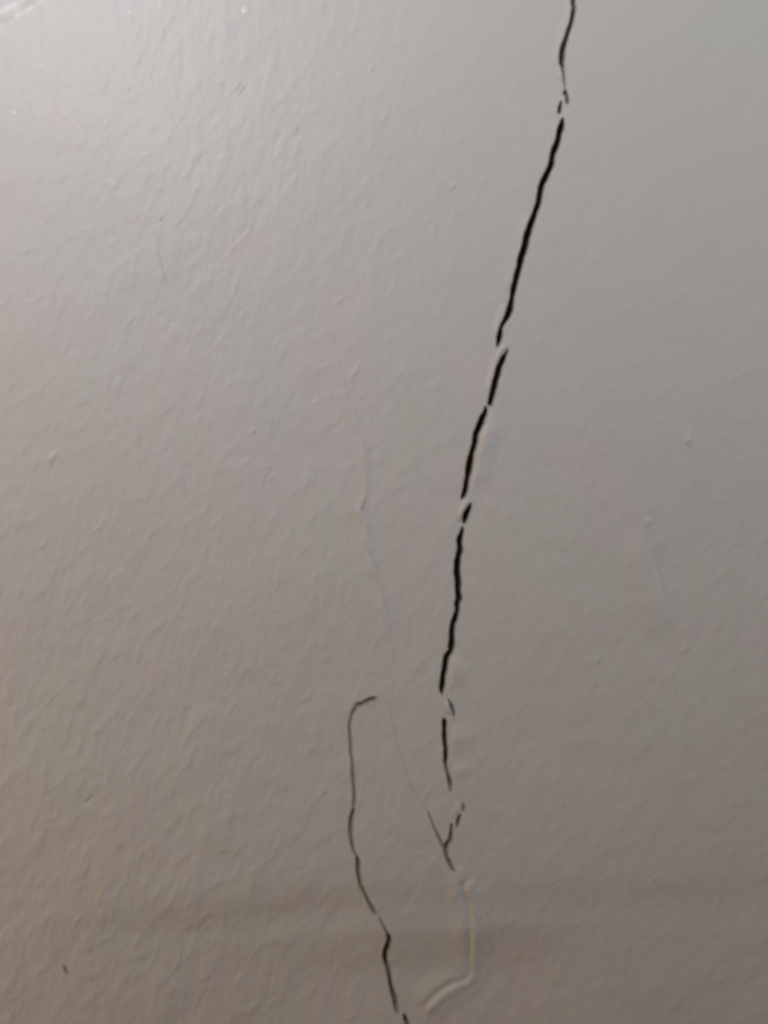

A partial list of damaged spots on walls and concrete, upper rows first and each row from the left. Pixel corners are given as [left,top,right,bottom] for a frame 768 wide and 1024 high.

crack [348,696,410,1024]
crack [427,0,576,871]